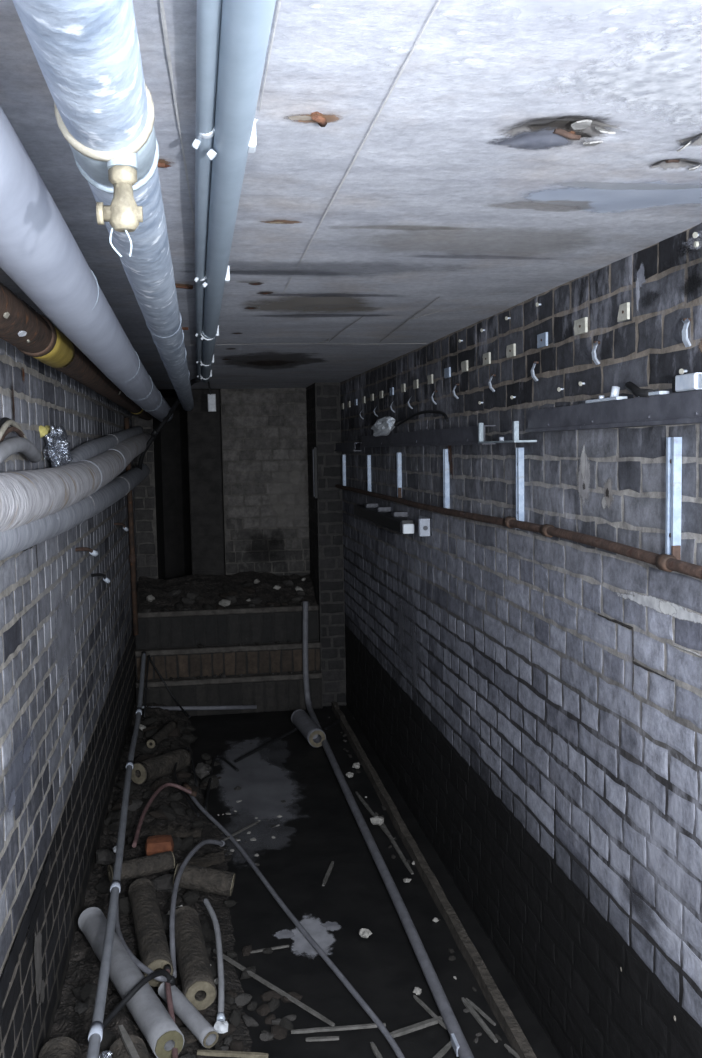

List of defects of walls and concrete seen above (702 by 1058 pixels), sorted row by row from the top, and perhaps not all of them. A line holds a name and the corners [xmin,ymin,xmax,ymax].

rust [289,111,339,127]
spalling [491,116,617,150]
spalling [650,133,702,171]